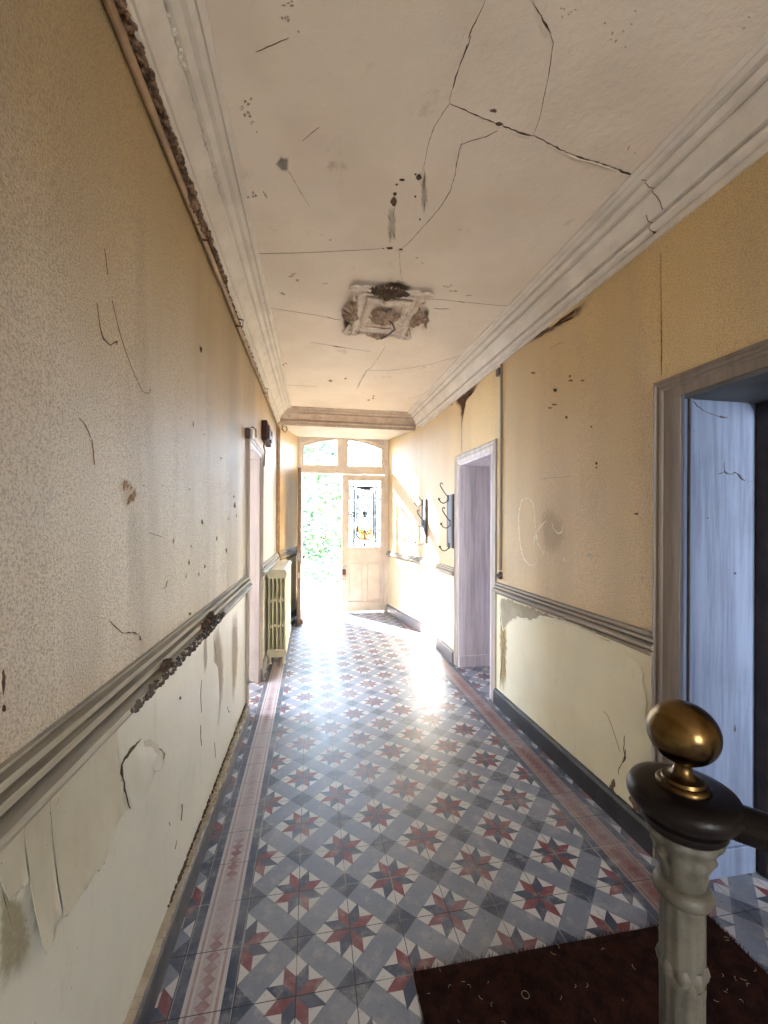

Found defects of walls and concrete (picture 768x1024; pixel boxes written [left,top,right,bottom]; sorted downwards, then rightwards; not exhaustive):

spalling [114,0,228,285]
crack [399,1,663,280]
crack [311,342,461,390]
crack [657,311,665,375]
spalling [130,611,226,715]
peeling [500,597,652,722]
crack [607,715,626,789]
peeling [0,730,124,955]